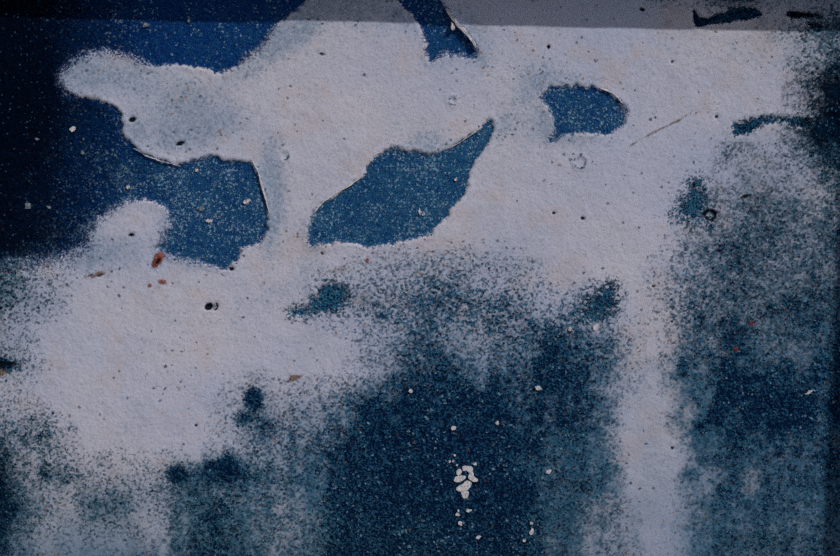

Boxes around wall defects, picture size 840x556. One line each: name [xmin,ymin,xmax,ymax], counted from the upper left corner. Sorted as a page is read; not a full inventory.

peeling [396,0,479,63]
peeling [693,7,762,27]
peeling [0,0,305,272]
peeling [541,83,628,143]
peeling [731,114,812,137]
peeling [306,119,494,254]
peeling [449,454,478,498]